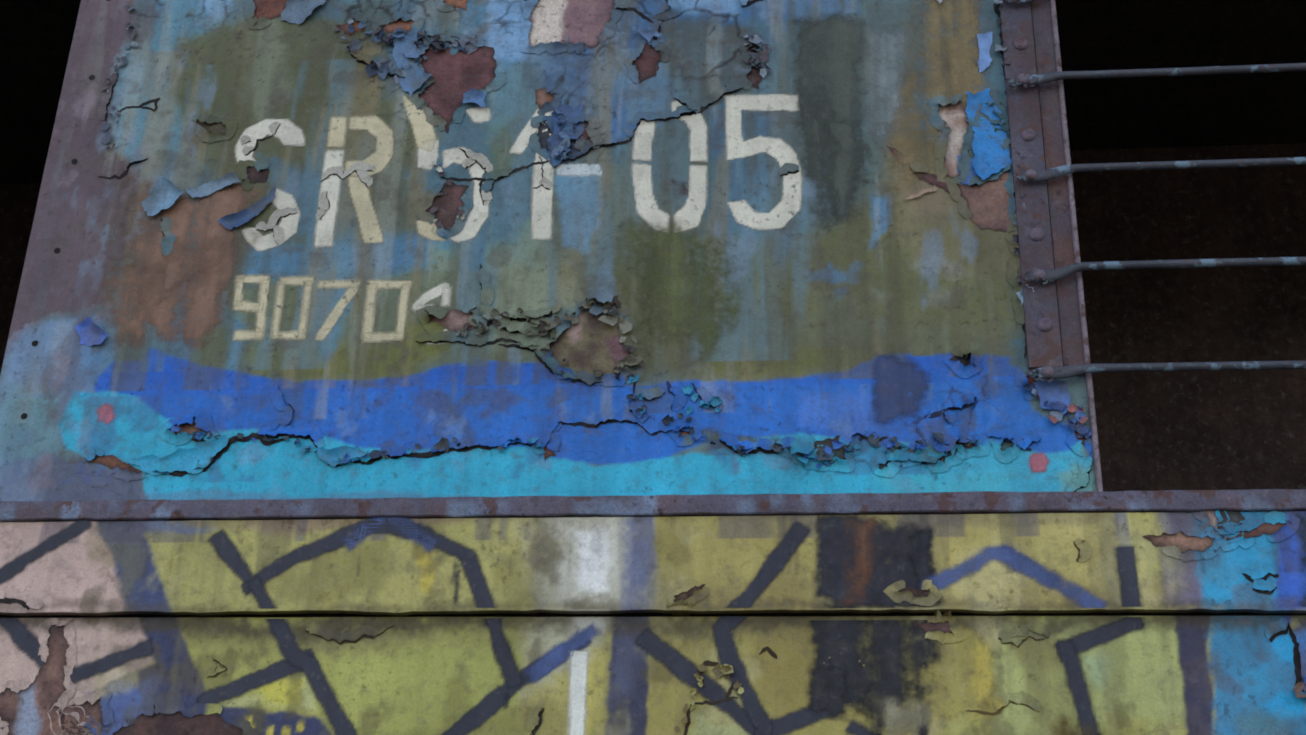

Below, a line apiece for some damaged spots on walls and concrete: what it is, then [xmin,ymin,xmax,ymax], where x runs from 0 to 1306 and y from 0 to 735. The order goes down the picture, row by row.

peeling [333,10,506,133]
peeling [737,35,773,90]
peeling [977,0,1011,73]
peeling [529,83,598,162]
peeling [142,159,276,230]
peeling [887,89,1039,256]
peeling [416,288,723,446]
peeling [98,404,114,423]
peeling [79,409,388,482]
peeling [771,426,1049,478]
peeling [1142,510,1300,562]
peeling [0,618,261,735]